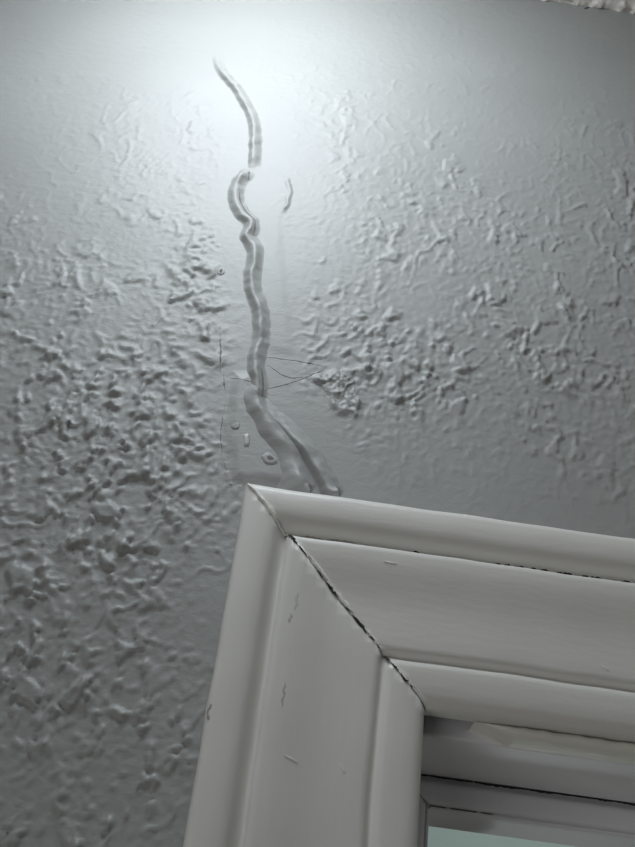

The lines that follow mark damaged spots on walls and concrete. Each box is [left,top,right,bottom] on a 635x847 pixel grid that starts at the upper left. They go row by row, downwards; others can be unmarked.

crack [211,48,423,704]